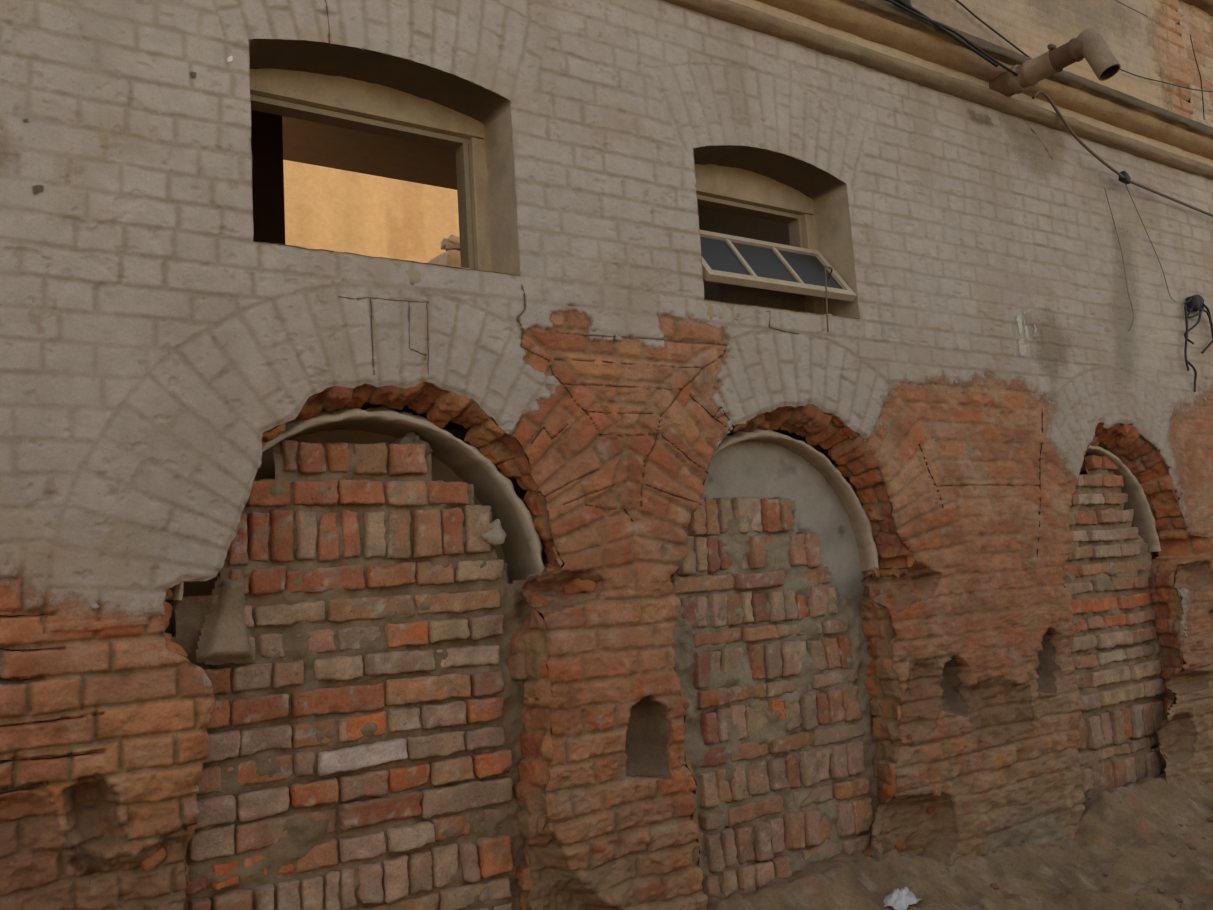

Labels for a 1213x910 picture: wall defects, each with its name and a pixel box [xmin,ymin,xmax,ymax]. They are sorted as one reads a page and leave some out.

peeling [0,310,1086,910]
crack [517,286,734,522]
peeling [1083,391,1213,793]